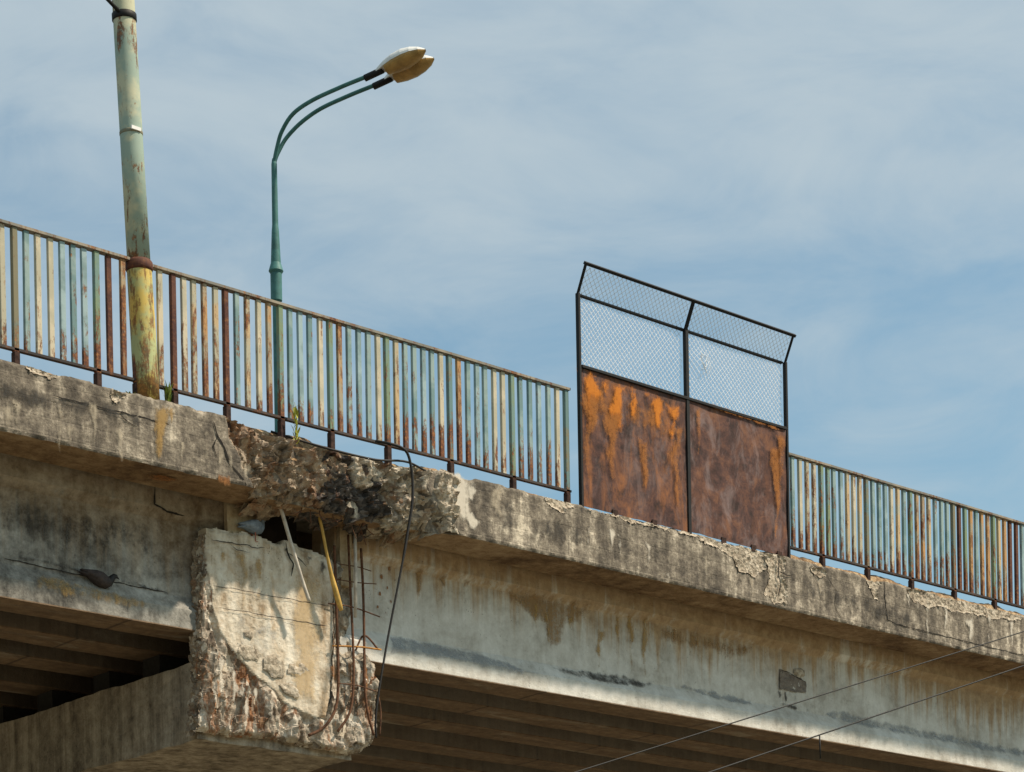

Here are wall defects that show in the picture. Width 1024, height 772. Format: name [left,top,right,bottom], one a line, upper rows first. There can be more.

crack [213,423,247,485]
rust [583,373,682,500]
rust [723,410,785,510]
crack [154,492,184,516]
crack [4,558,83,576]
spalling [185,416,478,755]
spalling [590,509,788,604]
crack [884,583,1023,655]
damp [391,638,522,673]
damp [563,669,645,686]